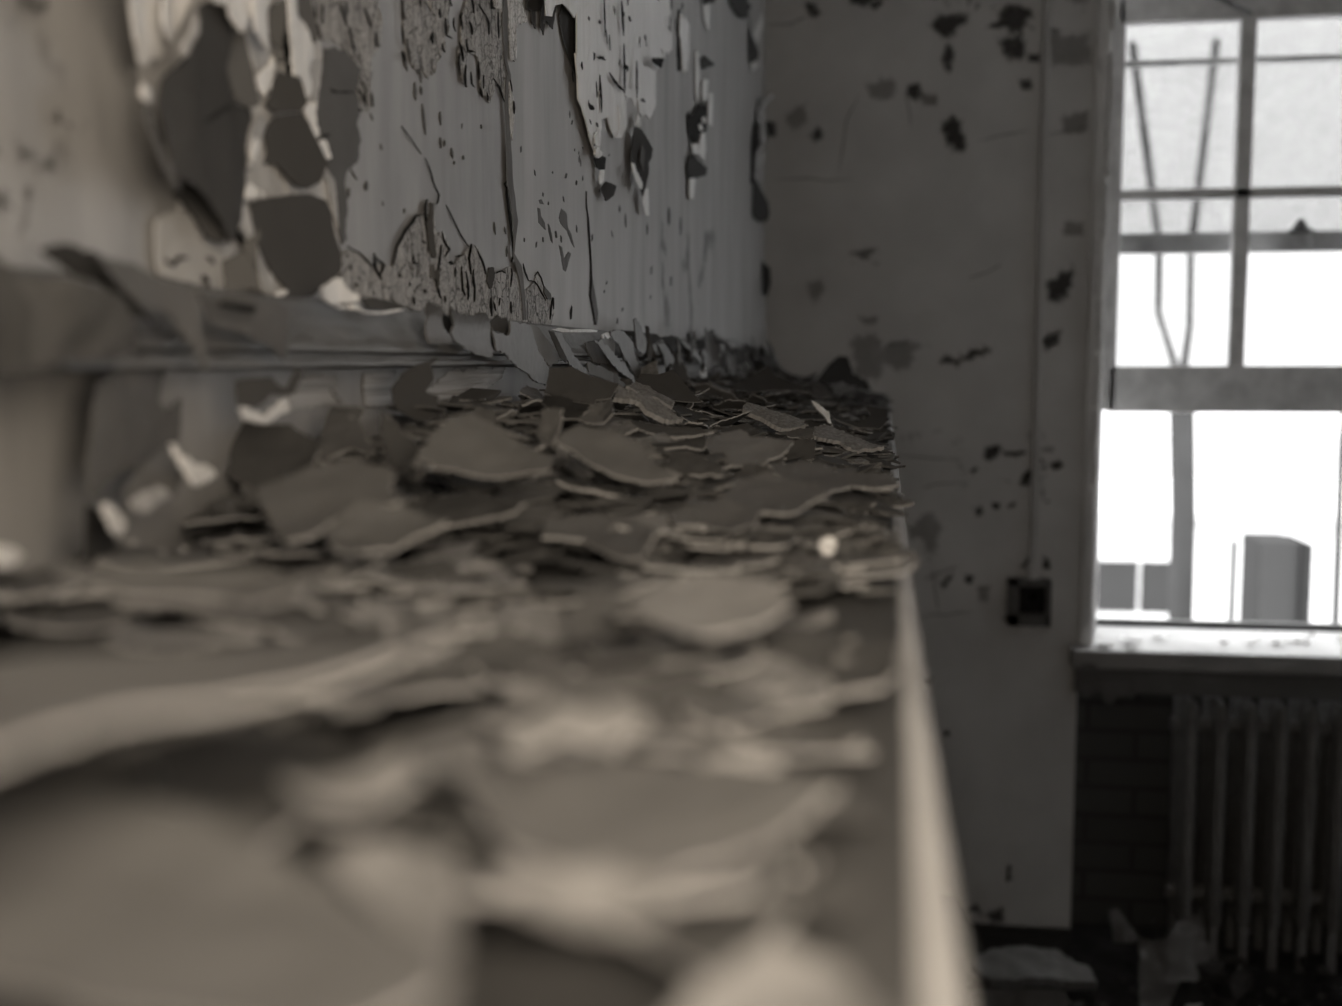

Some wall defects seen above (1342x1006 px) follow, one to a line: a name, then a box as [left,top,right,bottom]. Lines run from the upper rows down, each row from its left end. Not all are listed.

peeling [0,0,919,1006]